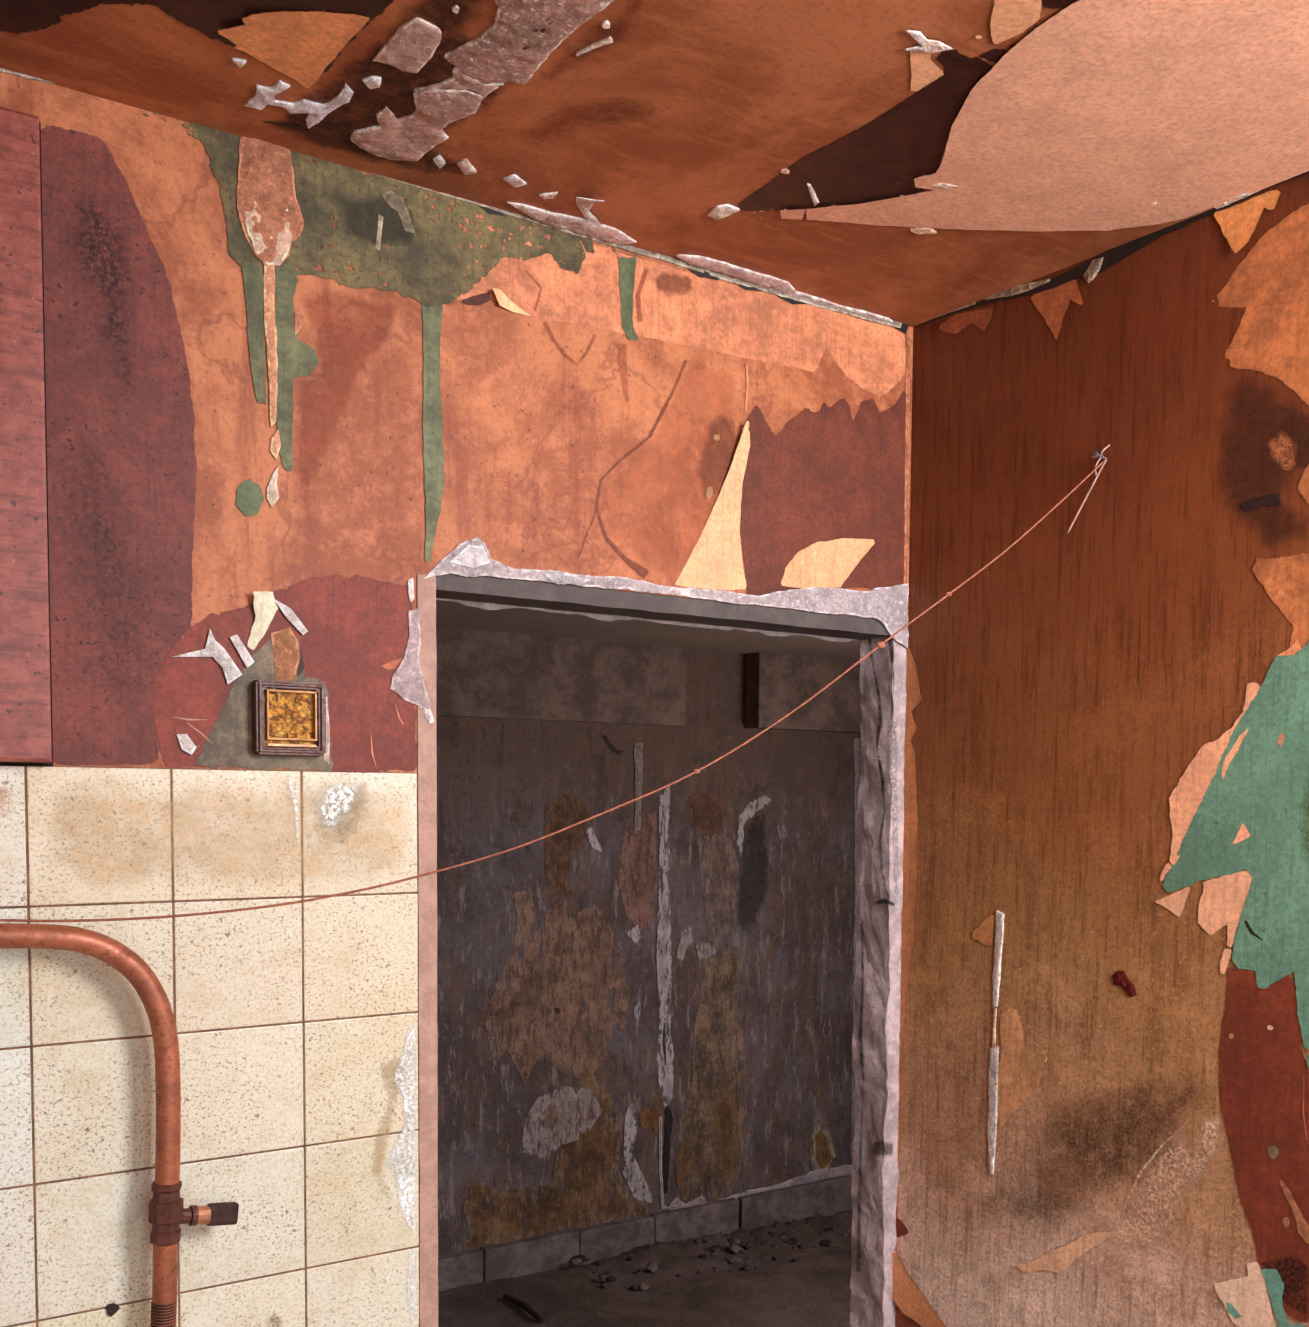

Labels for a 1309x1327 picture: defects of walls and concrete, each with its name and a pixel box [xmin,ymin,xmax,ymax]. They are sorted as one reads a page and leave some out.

peeling [0,0,393,73]
spalling [244,0,614,175]
peeling [738,41,1020,211]
peeling [1042,0,1078,11]
peeling [143,112,909,725]
leakage [544,322,595,362]
leakage [617,344,628,401]
leakage [635,269,691,322]
peeling [173,591,334,842]
peeling [1155,638,1309,1067]
leakage [1017,1088,1192,1213]